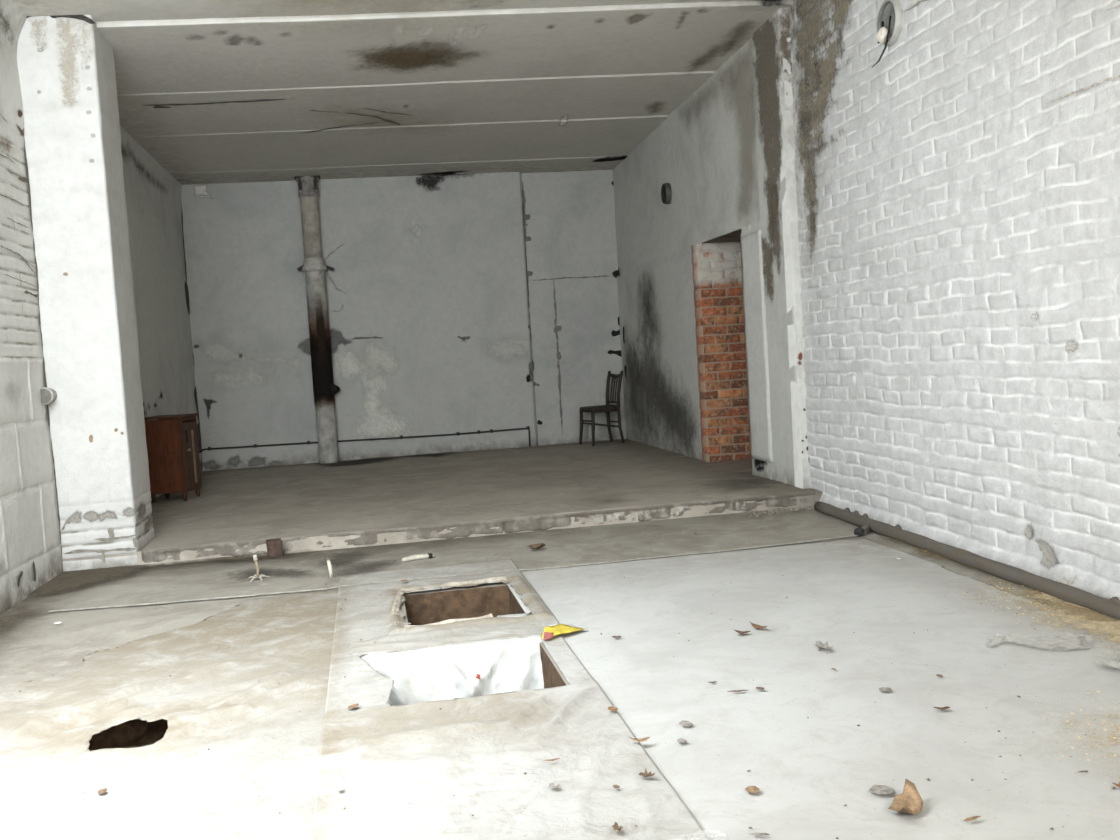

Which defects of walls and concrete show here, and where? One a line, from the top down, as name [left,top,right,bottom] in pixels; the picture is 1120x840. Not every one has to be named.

water stain [693,0,782,300]
water stain [796,0,852,254]
flaking render [298,338,311,355]
water stain [308,309,335,405]
peeling [330,329,406,436]
water stain [642,284,657,335]
water stain [626,348,693,440]